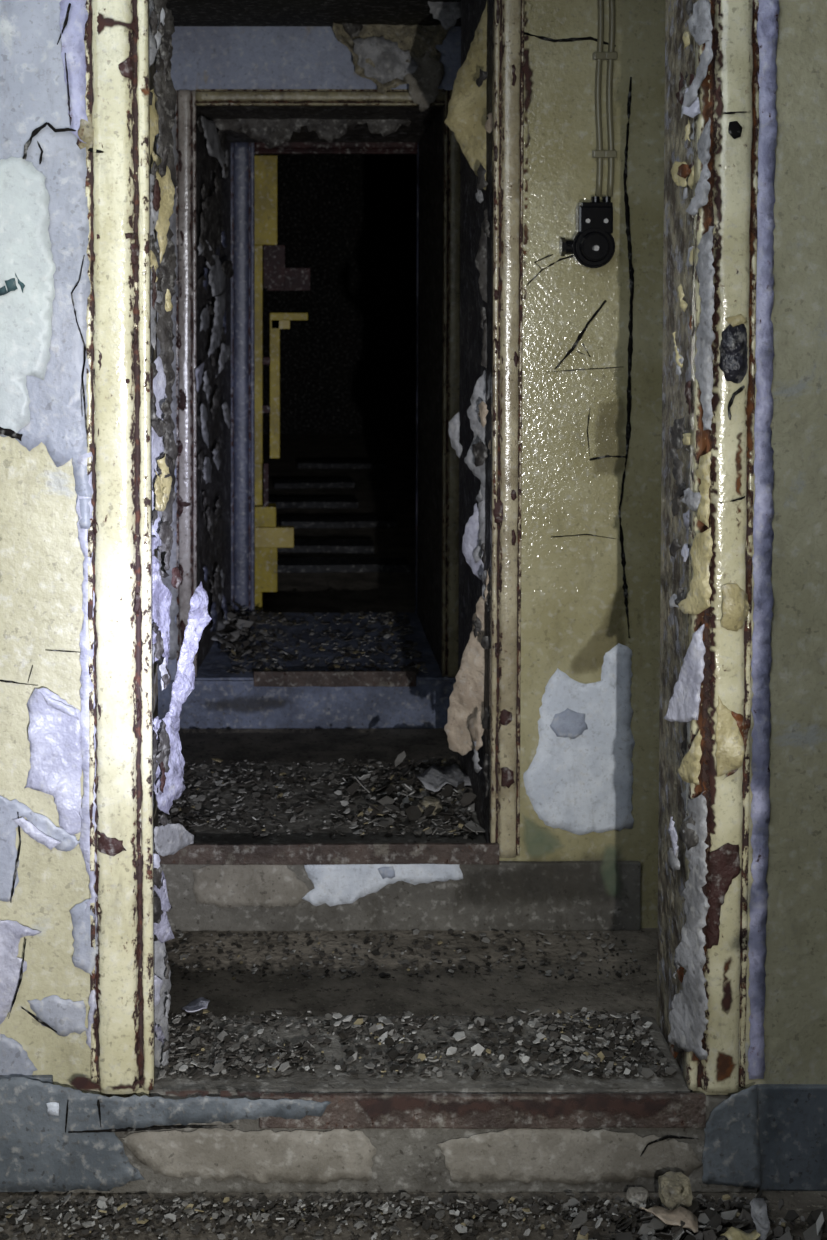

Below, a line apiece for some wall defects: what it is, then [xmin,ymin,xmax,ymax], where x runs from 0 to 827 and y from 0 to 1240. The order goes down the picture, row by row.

crack [22,3,104,164]
corrosion [86,13,139,50]
corrosion [118,57,149,95]
corrosion [125,233,157,309]
corrosion [735,13,759,527]
spalling [195,1,492,797]
corrosion [694,0,741,975]
peeling [0,0,377,1193]
peeling [437,0,780,1188]
spalling [191,864,463,909]
corrosion [721,958,733,1013]
corrosion [716,1052,735,1081]